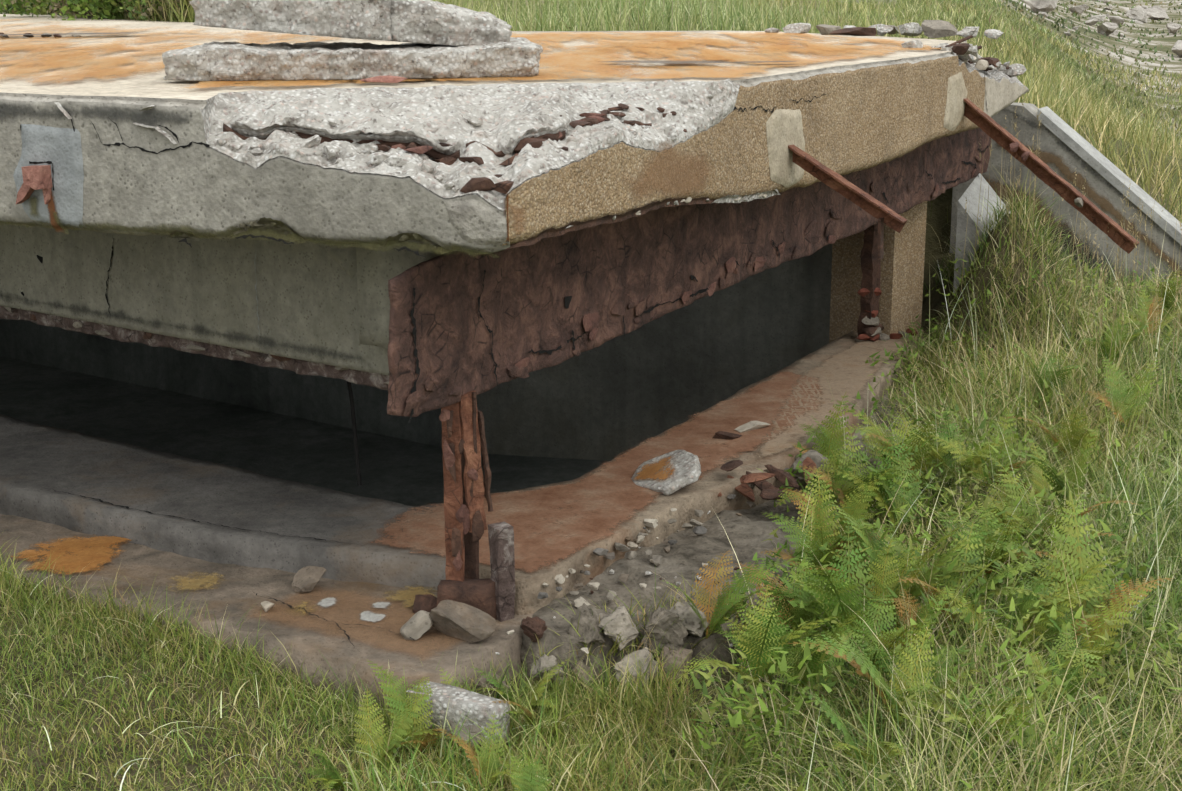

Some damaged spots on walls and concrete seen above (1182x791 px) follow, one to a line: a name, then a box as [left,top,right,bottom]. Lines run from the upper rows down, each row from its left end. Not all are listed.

corrosion [361,75,407,83]
corrosion [30,191,68,232]
crack [91,122,210,154]
spalling [204,78,780,249]
corrosion [972,156,1089,254]
corrosion [1024,145,1182,276]
crack [105,237,114,313]
corrosion [369,372,823,572]